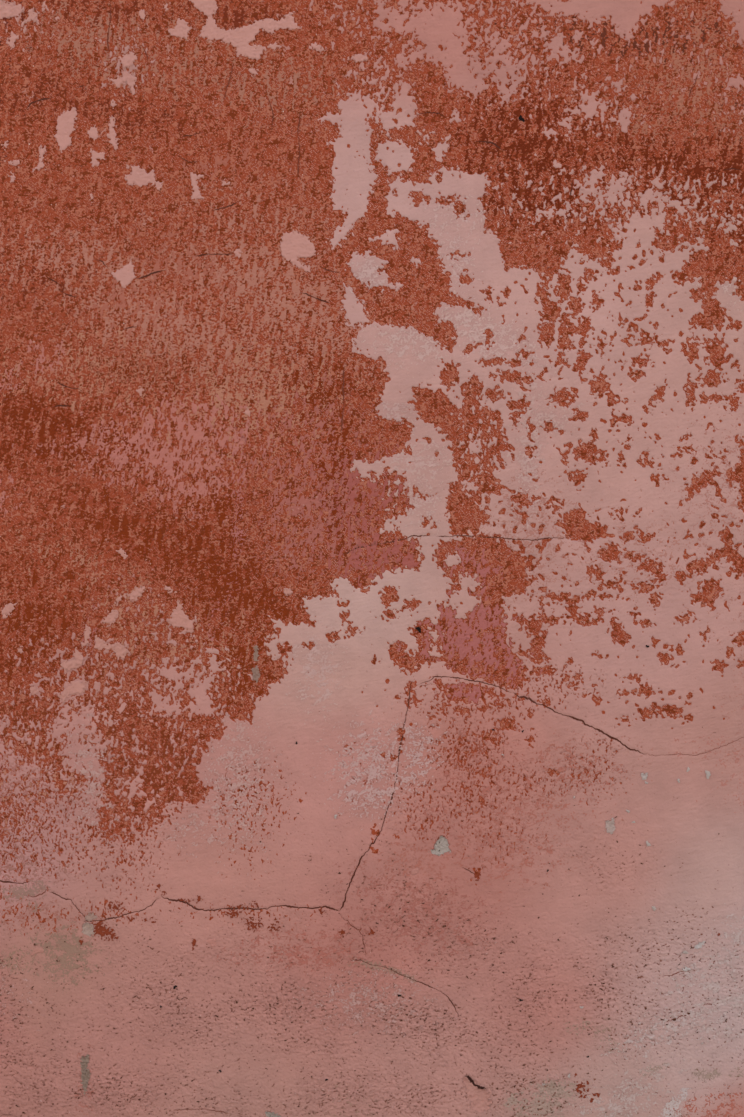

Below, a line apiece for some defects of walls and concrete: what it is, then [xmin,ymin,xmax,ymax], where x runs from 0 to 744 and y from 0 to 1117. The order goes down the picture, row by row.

crack [0,676,743,1017]
spalling [303,922,461,1115]